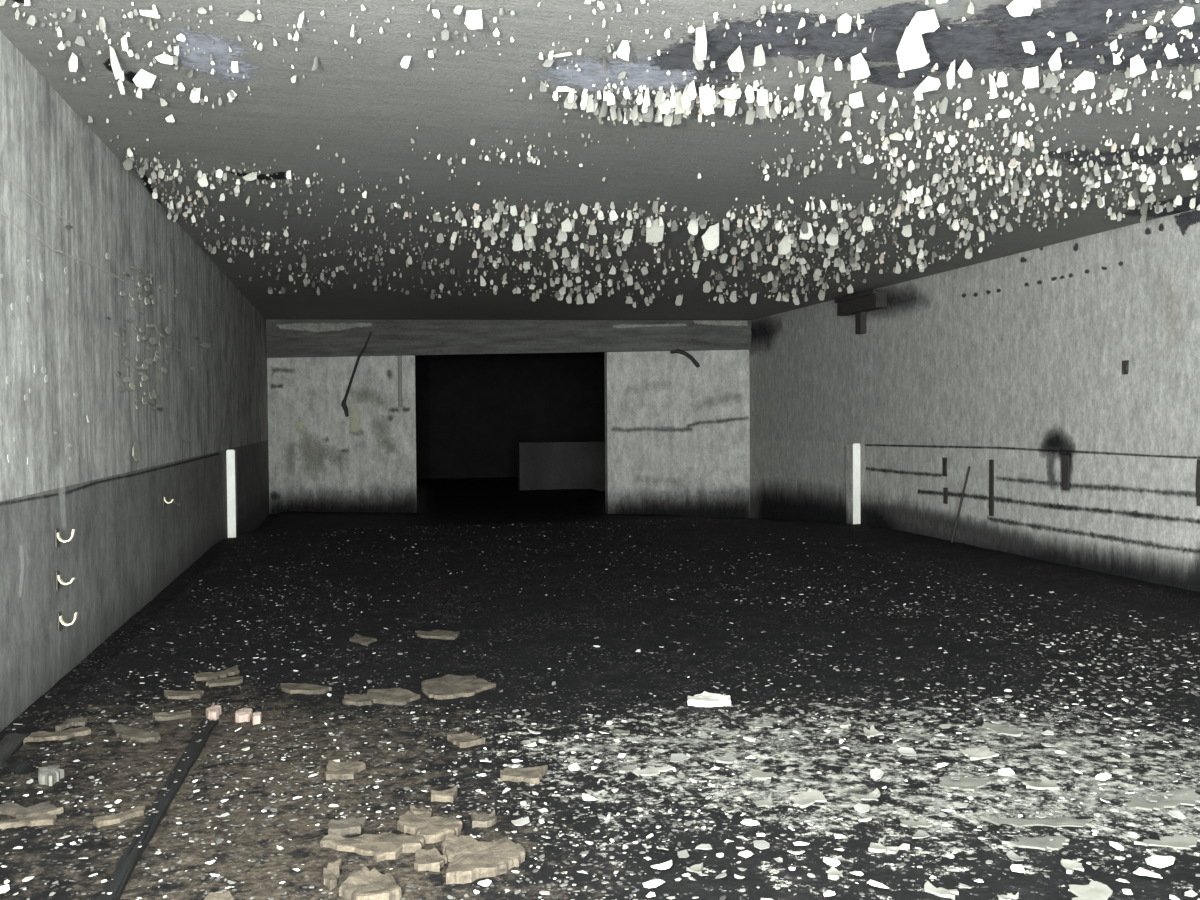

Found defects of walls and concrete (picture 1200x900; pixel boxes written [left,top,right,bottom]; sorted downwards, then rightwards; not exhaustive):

peeling [0,0,394,123]
peeling [110,0,1200,308]
peeling [107,266,181,411]
flaking render [276,322,372,332]
flaking render [612,320,748,328]
crack [618,418,744,431]